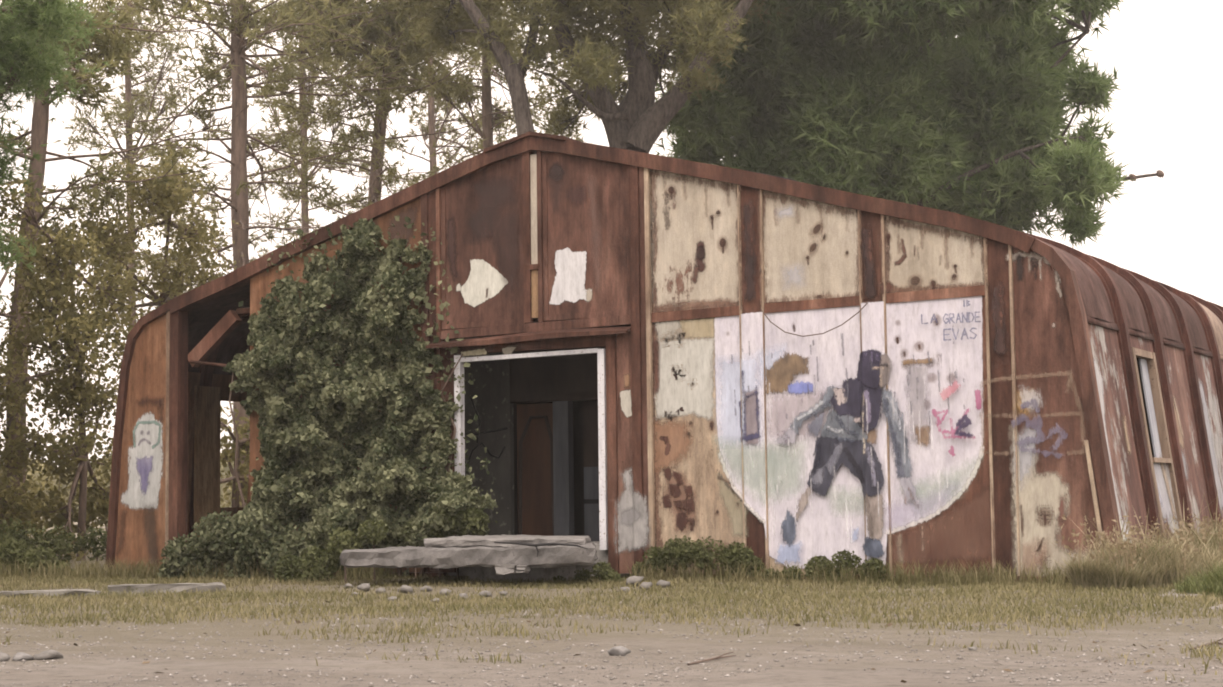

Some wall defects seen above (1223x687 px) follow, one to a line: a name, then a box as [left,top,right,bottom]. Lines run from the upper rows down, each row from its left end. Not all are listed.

rust [650,170,995,566]
rust [145,509,157,563]
peeling [1012,429,1095,576]
peeling [1094,361,1128,540]
peeling [1153,462,1176,520]
peeling [1172,398,1187,476]
peeling [1199,381,1223,508]